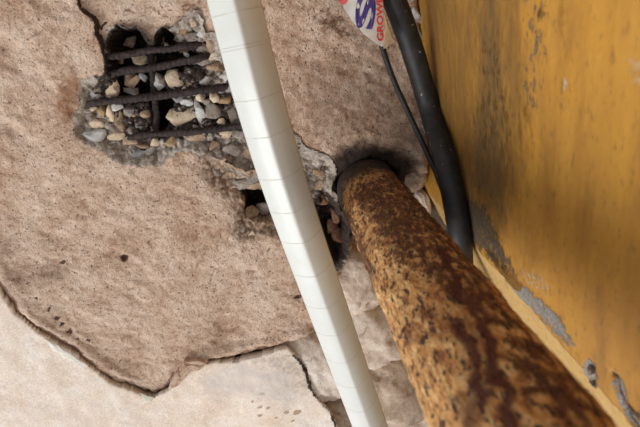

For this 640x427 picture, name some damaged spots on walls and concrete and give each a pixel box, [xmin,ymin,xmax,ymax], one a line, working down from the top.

crack [77,0,108,72]
spalling [73,10,281,243]
spalling [294,134,351,273]
peeling [427,192,446,225]
peeling [44,338,88,369]
spalling [168,357,208,391]
crack [292,355,336,427]
peeling [473,246,633,427]